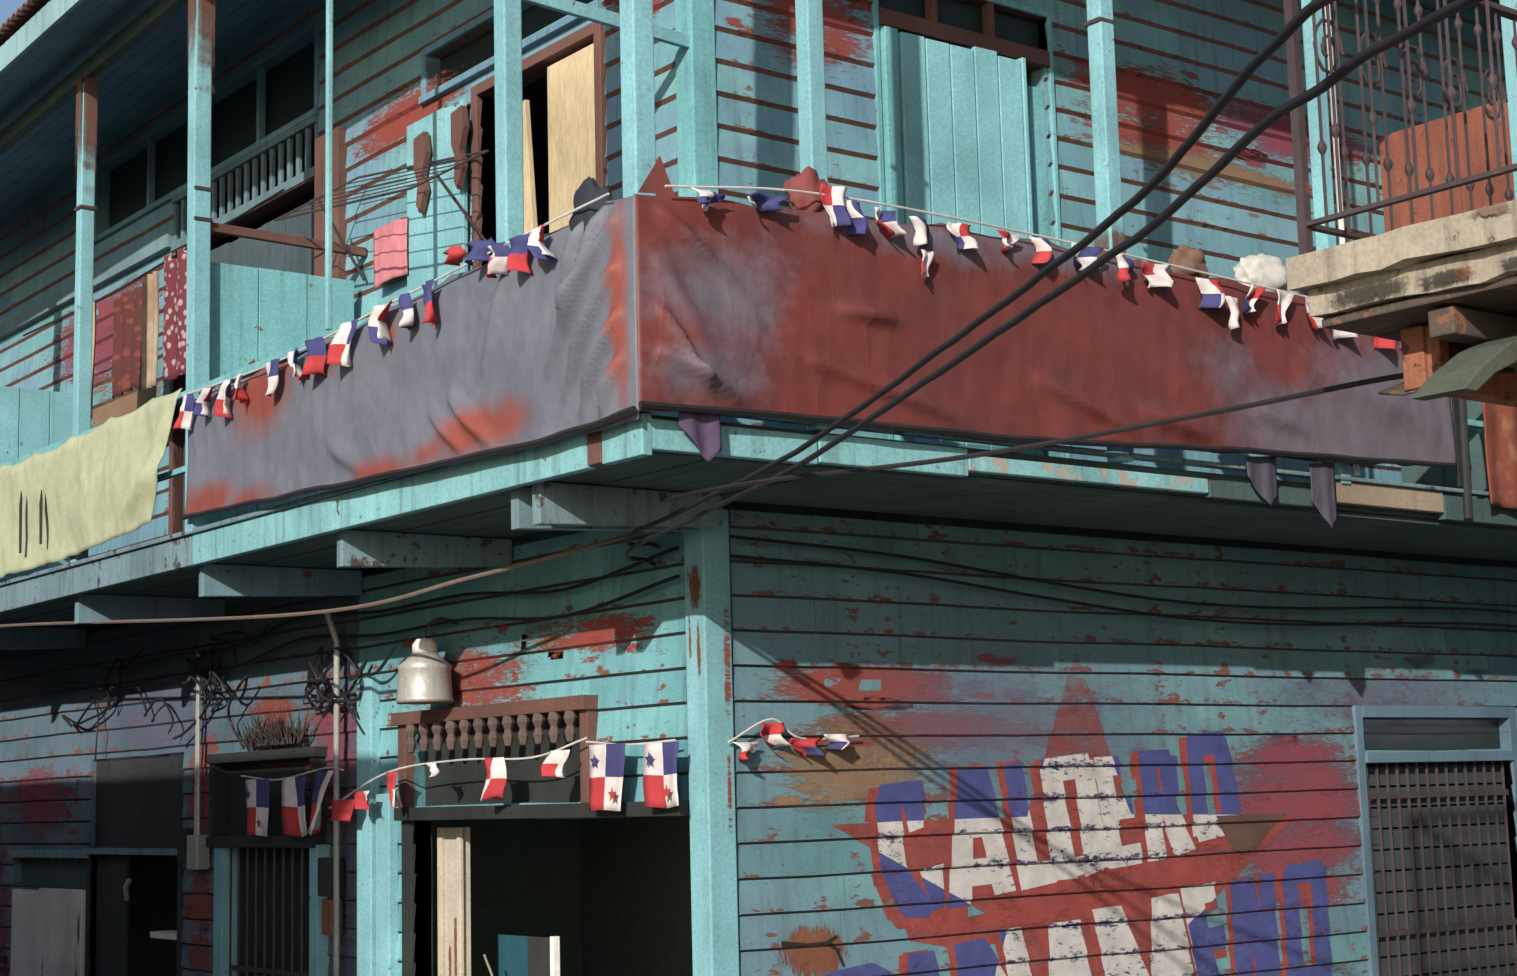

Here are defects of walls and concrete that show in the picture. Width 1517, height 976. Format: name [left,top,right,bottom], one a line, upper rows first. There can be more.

peeling [726,0,797,68]
peeling [822,0,874,78]
peeling [347,66,468,167]
peeling [1055,55,1093,148]
peeling [1114,41,1314,215]
peeling [1329,118,1382,213]
peeling [423,604,661,710]
peeling [768,653,1142,819]
peeling [0,766,91,976]